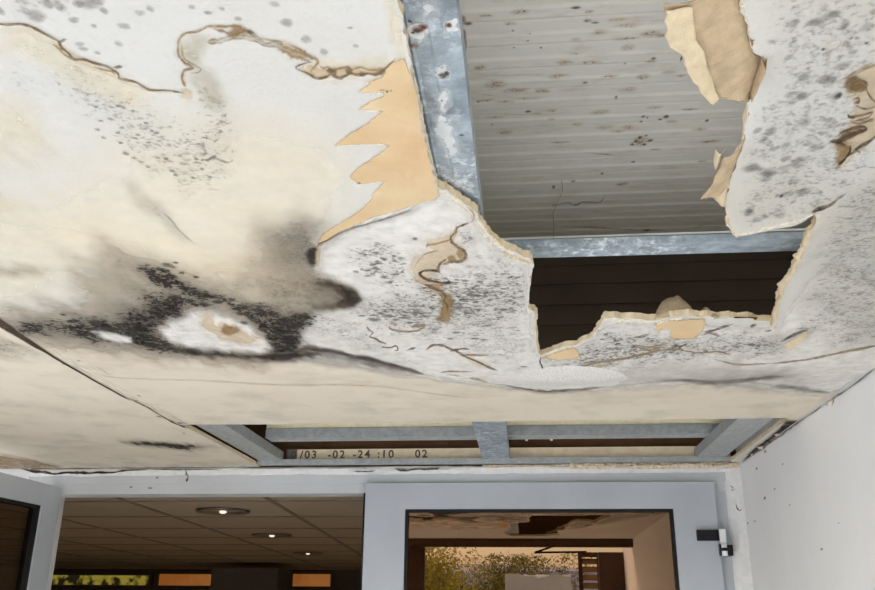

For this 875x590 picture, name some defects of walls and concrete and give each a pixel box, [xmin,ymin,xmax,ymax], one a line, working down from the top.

water stain [0,23,393,95]
corrosion [407,4,434,48]
corrosion [435,65,451,79]
corrosion [446,17,471,48]
corrosion [434,91,464,155]
water stain [808,65,875,171]
water stain [0,168,415,373]
peeling [0,26,875,469]
water stain [354,211,522,370]